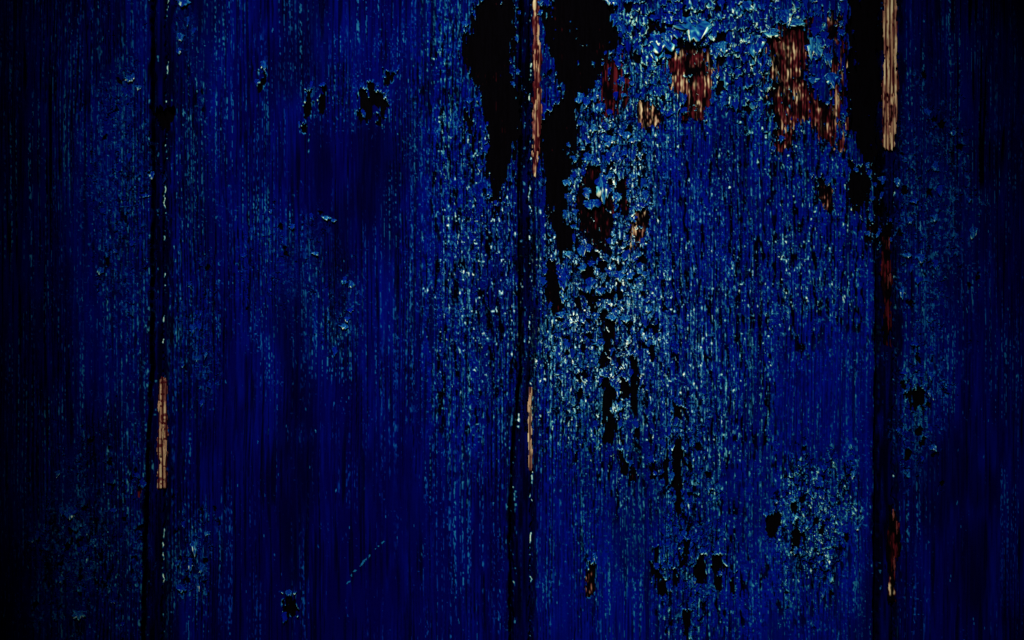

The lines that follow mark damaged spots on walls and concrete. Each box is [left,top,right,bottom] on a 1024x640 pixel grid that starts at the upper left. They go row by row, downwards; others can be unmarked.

peeling [254,60,267,93]
peeling [298,81,326,133]
peeling [354,65,400,126]
peeling [457,0,522,219]
peeling [537,0,860,640]